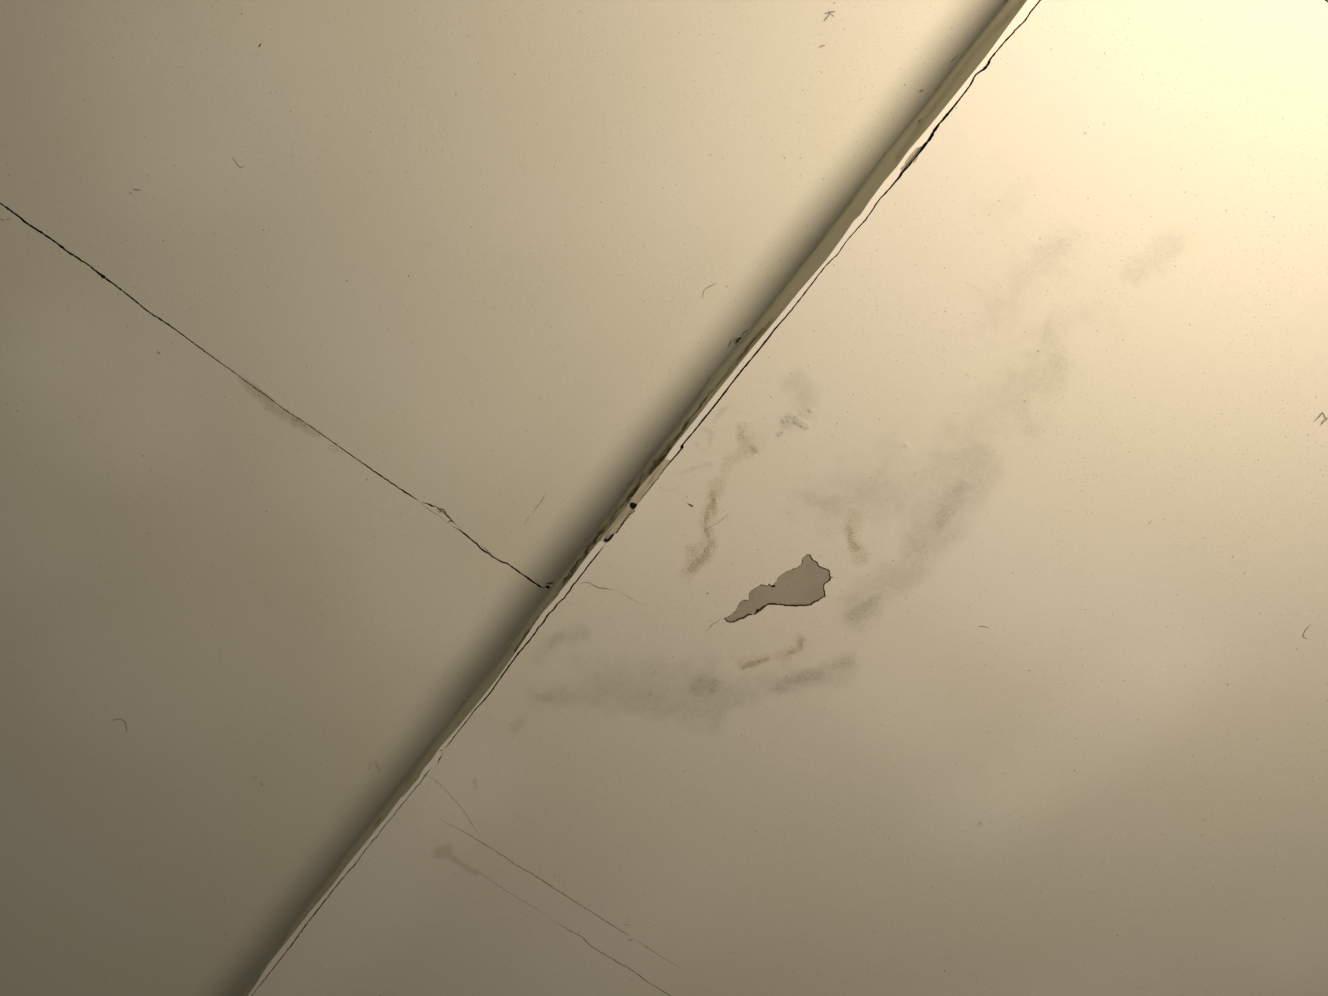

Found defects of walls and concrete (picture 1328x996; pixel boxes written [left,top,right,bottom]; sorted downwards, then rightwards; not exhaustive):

leakage [611,439,674,519]
crack [0,203,687,996]
peeling [708,554,834,629]